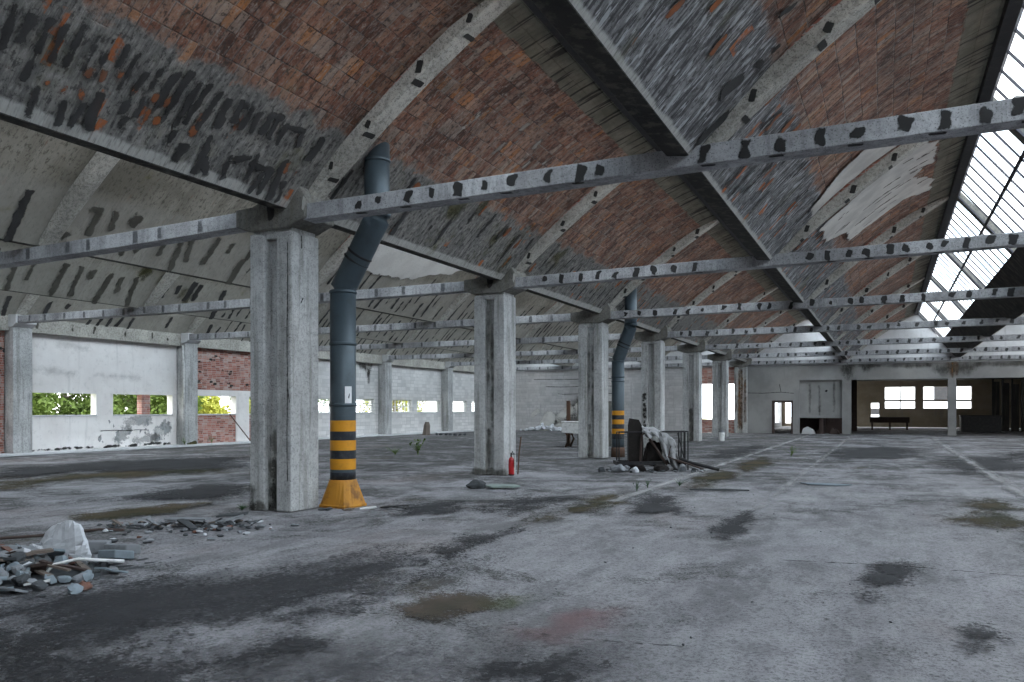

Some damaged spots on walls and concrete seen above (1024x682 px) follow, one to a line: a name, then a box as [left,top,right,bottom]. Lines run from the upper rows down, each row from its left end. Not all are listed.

damp [0,4,325,221]
damp [697,44,781,167]
flaking render [797,141,938,250]
flaking render [367,244,462,280]
flaking render [32,416,171,452]